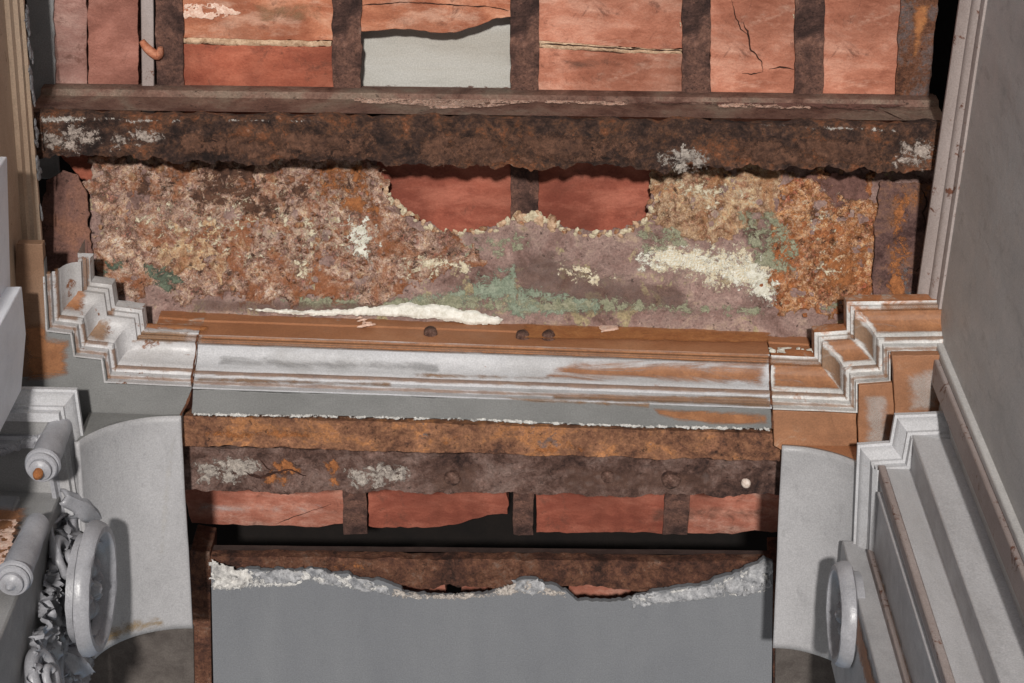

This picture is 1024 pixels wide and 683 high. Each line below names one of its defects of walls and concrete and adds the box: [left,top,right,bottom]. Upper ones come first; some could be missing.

crack [732,2,791,75]
rust [41,121,165,154]
rust [656,143,710,174]
rust [122,161,380,285]
flaking render [379,183,655,239]
damp [557,264,624,286]
damp [636,237,786,306]
rust [25,193,943,424]
rust [195,456,301,486]
rust [325,459,411,489]
flaking render [208,560,567,600]
flaking render [629,561,773,609]